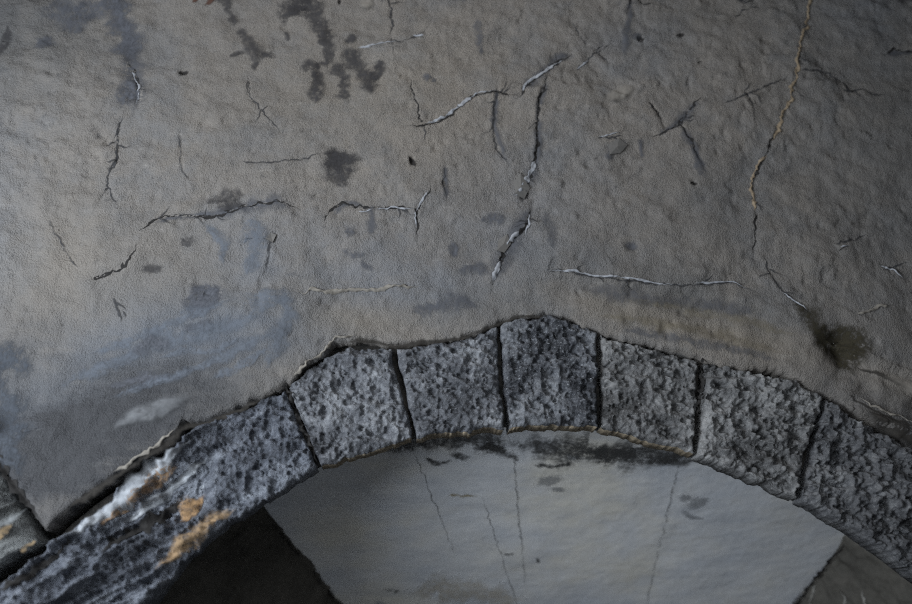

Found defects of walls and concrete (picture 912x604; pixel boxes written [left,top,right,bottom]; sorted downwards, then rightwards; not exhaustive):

leakage [217,0,271,69]
leakage [279,0,385,101]
crack [410,24,608,281]
crack [547,0,881,310]
crack [324,168,448,234]
crack [49,199,294,280]
crack [113,298,126,321]
leakage [795,304,870,369]
rust [101,466,174,524]
flaking render [71,402,256,506]
leakage [389,433,691,492]
rust [160,498,229,564]